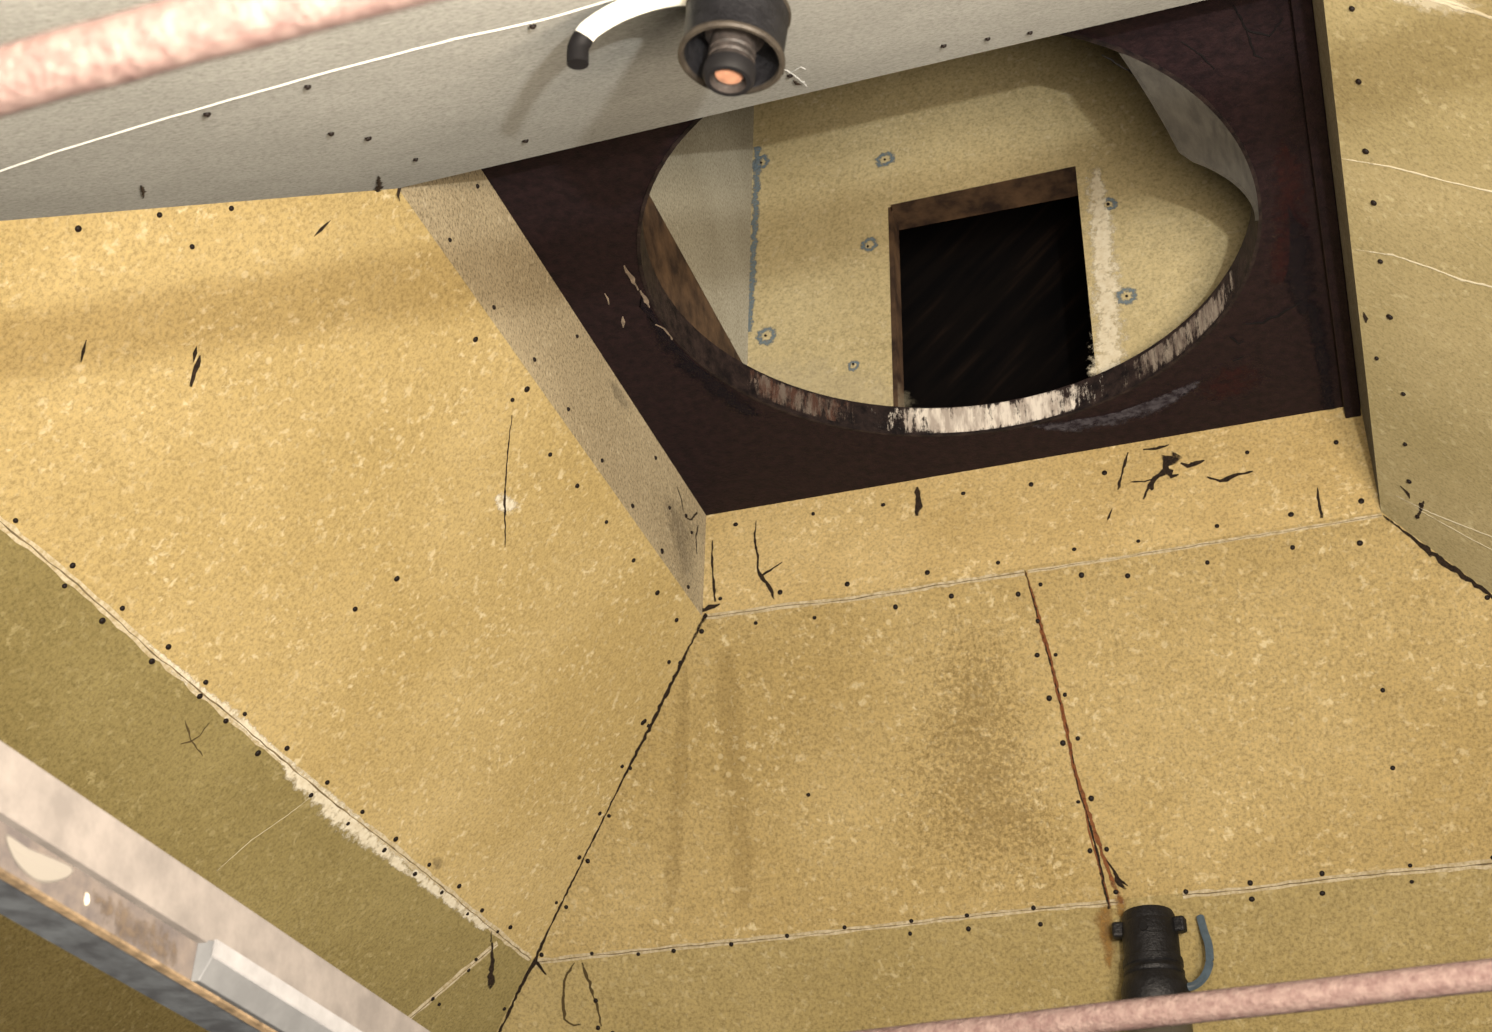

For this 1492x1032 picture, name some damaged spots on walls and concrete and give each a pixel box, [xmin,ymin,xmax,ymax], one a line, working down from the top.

crack [503,420,512,546]
crack [754,523,782,599]
crack [1107,444,1253,521]
crack [498,487,720,1032]
corrosion [1026,572,1124,965]
crack [1025,571,1128,909]